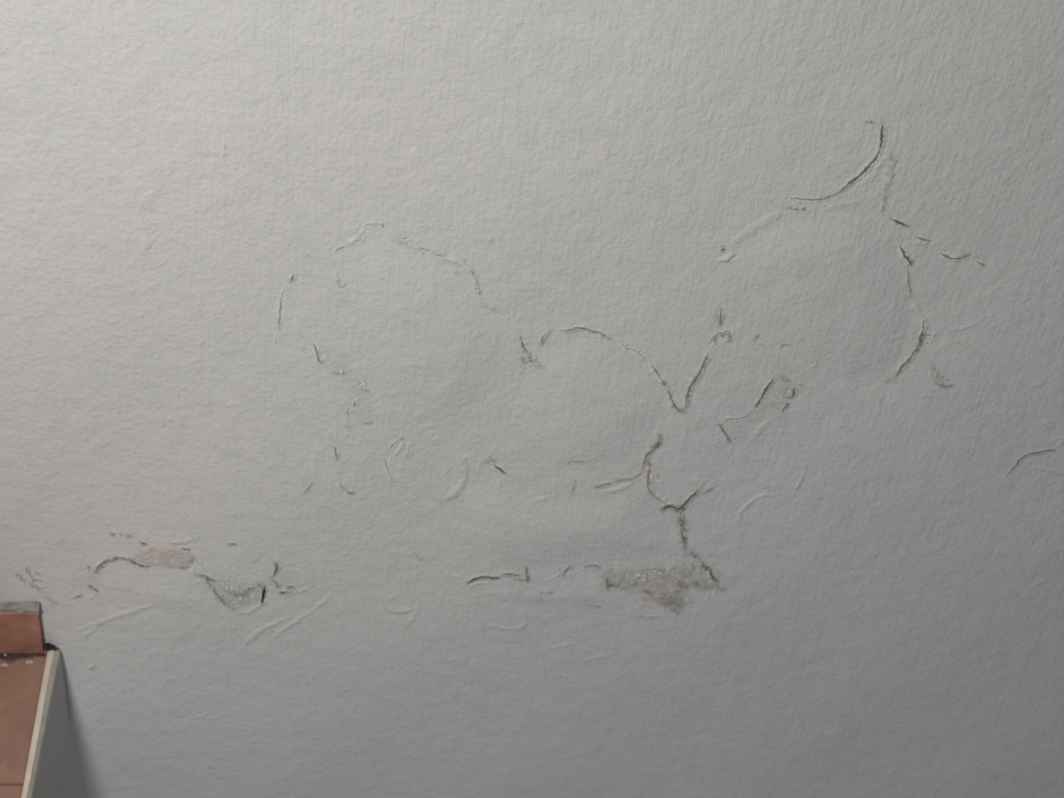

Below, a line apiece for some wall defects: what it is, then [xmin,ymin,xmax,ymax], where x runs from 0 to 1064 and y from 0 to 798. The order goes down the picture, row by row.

crack [785,119,893,204]
crack [273,272,305,352]
crack [330,221,493,310]
crack [889,217,987,377]
crack [539,324,718,413]
crack [333,445,369,501]
crack [565,436,715,547]
crack [1005,442,1064,478]
spalling [95,535,314,616]
crack [466,570,519,589]
crack [549,562,602,580]